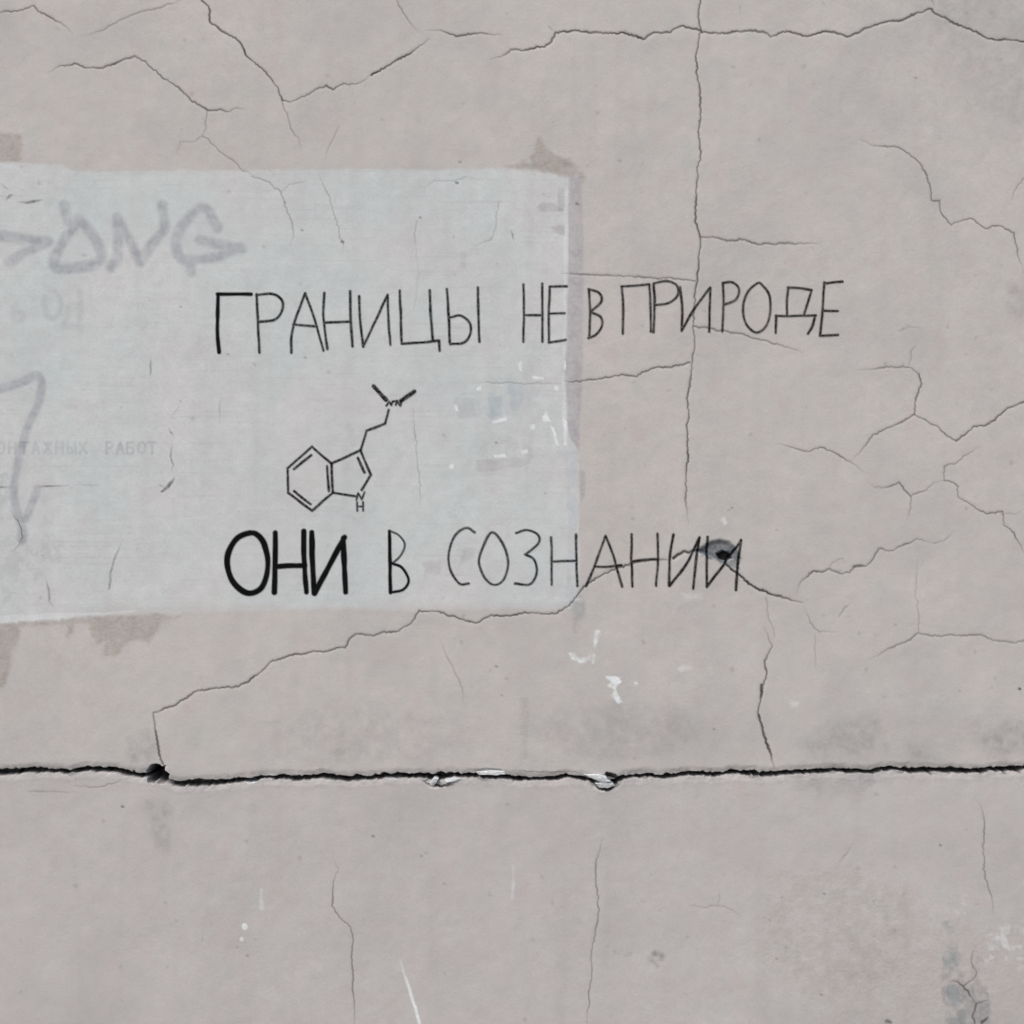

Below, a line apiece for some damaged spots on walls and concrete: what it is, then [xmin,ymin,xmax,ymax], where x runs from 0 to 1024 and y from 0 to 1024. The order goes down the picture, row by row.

crack [0,0,1024,524]
crack [0,325,1024,918]